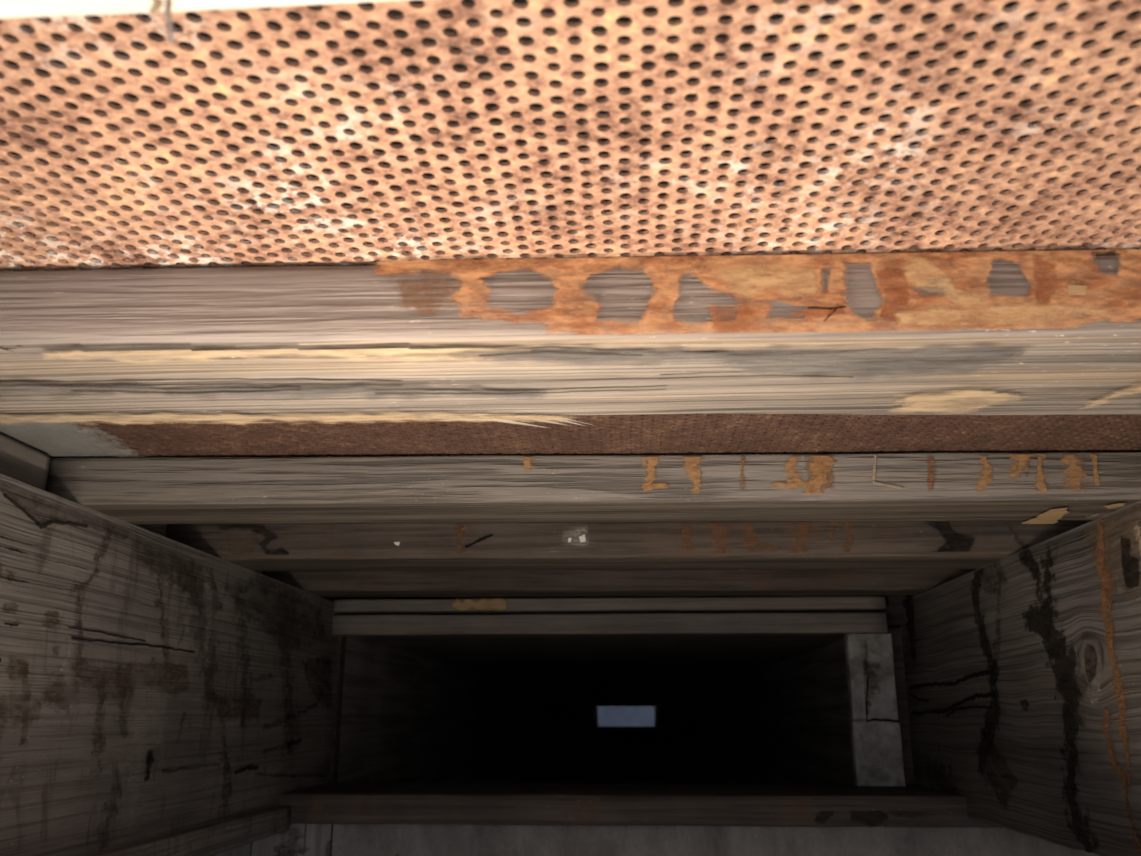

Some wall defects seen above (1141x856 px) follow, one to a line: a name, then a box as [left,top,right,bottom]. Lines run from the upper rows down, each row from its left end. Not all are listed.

rust [375,249,1141,335]
rust [642,457,668,491]
rust [684,457,702,493]
rust [772,455,835,494]
rust [1061,454,1100,491]
leakage [0,485,127,602]
leakage [928,522,975,552]
crack [68,627,195,653]
leakage [0,549,331,846]
crack [866,668,995,723]
leakage [971,564,1016,805]
leakage [1015,536,1099,853]